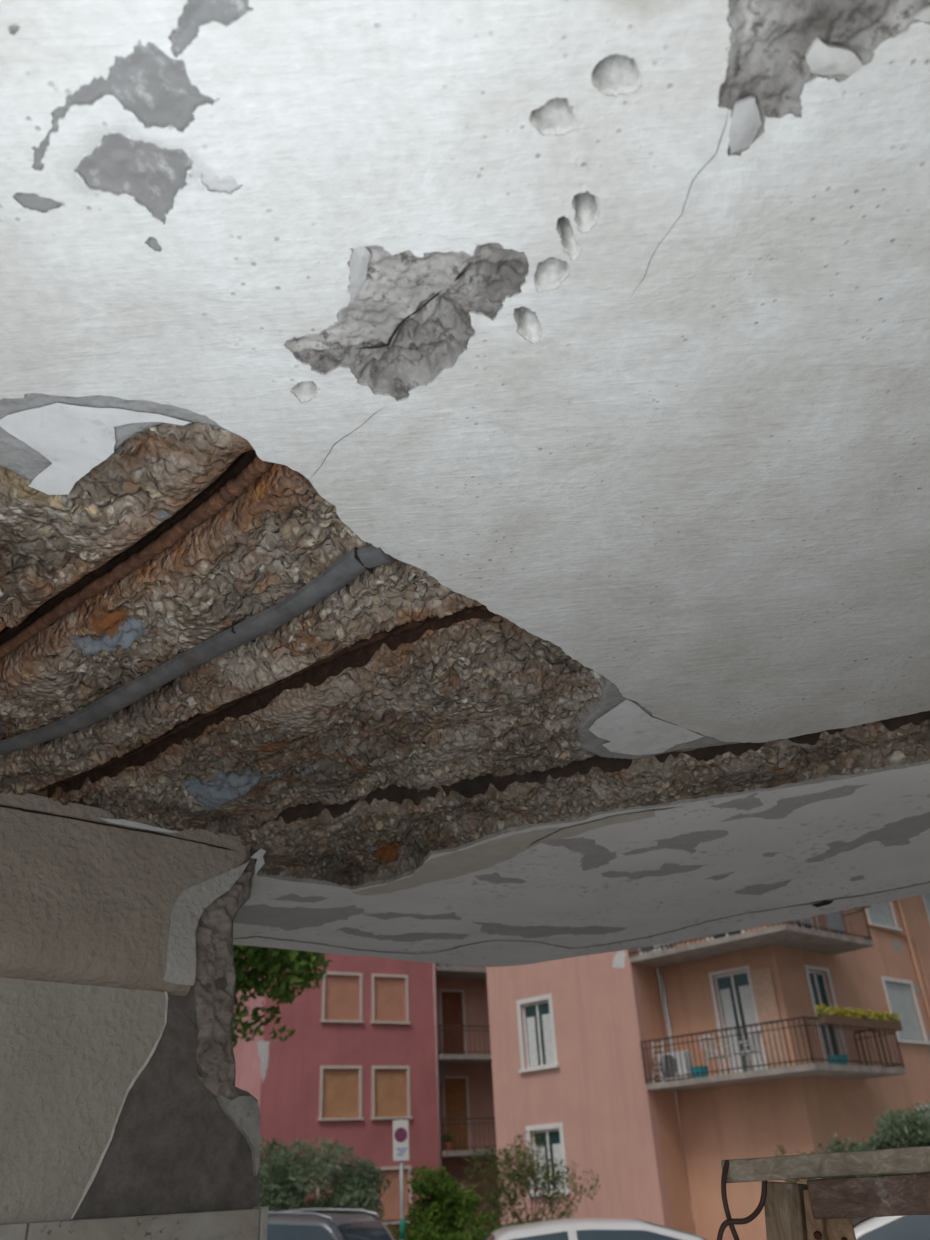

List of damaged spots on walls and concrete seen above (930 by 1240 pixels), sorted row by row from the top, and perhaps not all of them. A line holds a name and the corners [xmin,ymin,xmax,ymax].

peeling [32,0,253,224]
flaking render [529,97,578,136]
flaking render [591,54,642,97]
flaking render [718,0,930,156]
flaking render [13,192,62,213]
flaking render [145,237,162,252]
flaking render [284,191,600,403]
crack [629,111,729,299]
rust [96,610,128,635]
spalling [0,393,930,1220]